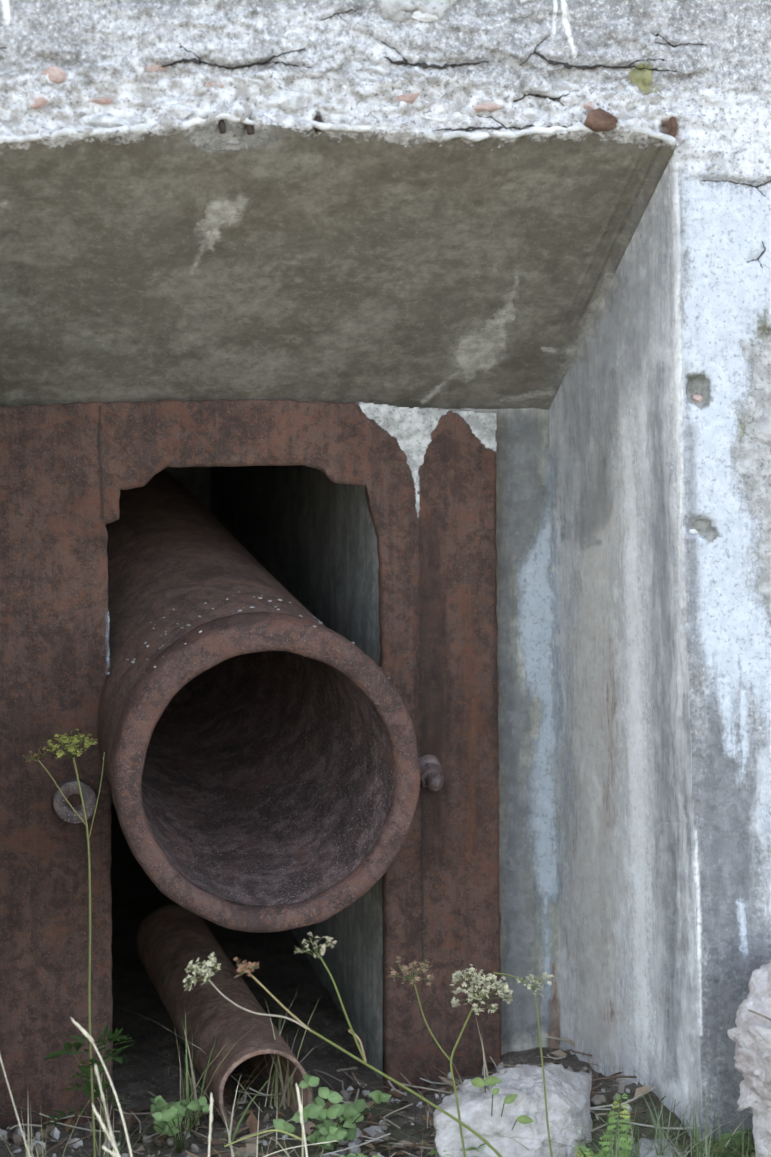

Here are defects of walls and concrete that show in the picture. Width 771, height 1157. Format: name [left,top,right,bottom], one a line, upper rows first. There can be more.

crack [160,46,311,70]
spalling [0,59,685,157]
crack [380,41,489,69]
crack [433,32,708,132]
leakage [194,196,249,267]
crack [701,180,771,197]
leakage [420,276,520,405]
peeling [669,170,771,923]
leakage [499,161,766,1143]
peeling [736,901,748,955]